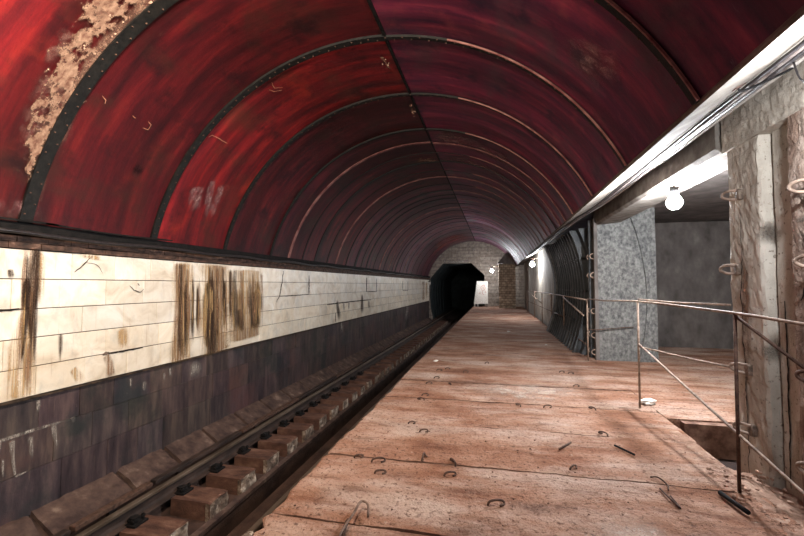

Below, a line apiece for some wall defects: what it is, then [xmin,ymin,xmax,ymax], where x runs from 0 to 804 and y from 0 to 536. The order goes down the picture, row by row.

peeling [25,0,154,183]
rust [8,250,42,398]
rust [172,264,200,361]
rust [232,270,263,341]